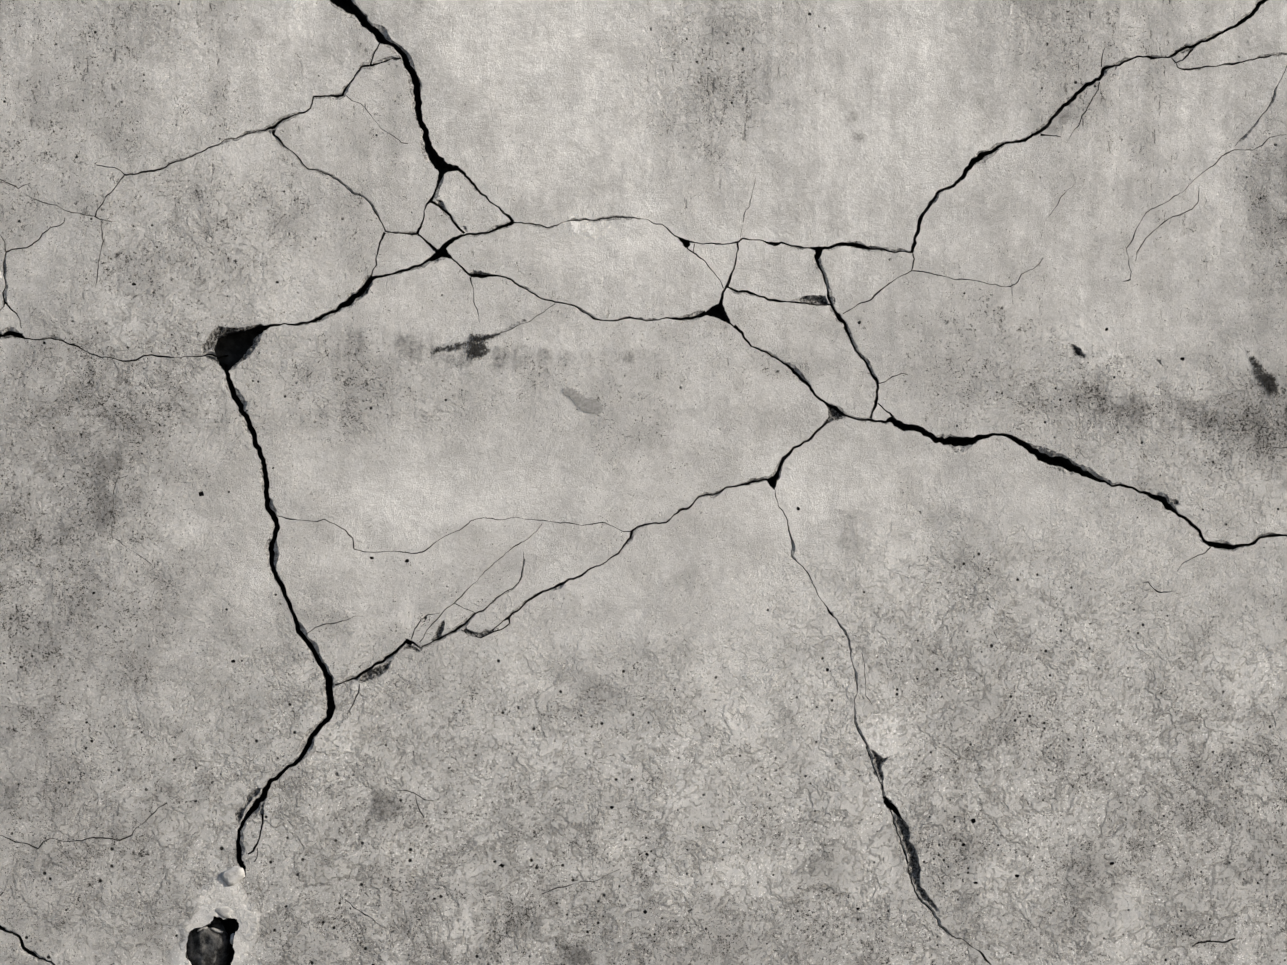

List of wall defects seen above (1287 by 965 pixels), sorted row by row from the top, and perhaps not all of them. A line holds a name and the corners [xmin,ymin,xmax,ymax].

crack [0,0,641,875]
crack [335,0,1287,686]
crack [0,892,55,965]
crack [542,869,619,894]
crack [775,493,991,965]
crack [1192,938,1235,947]